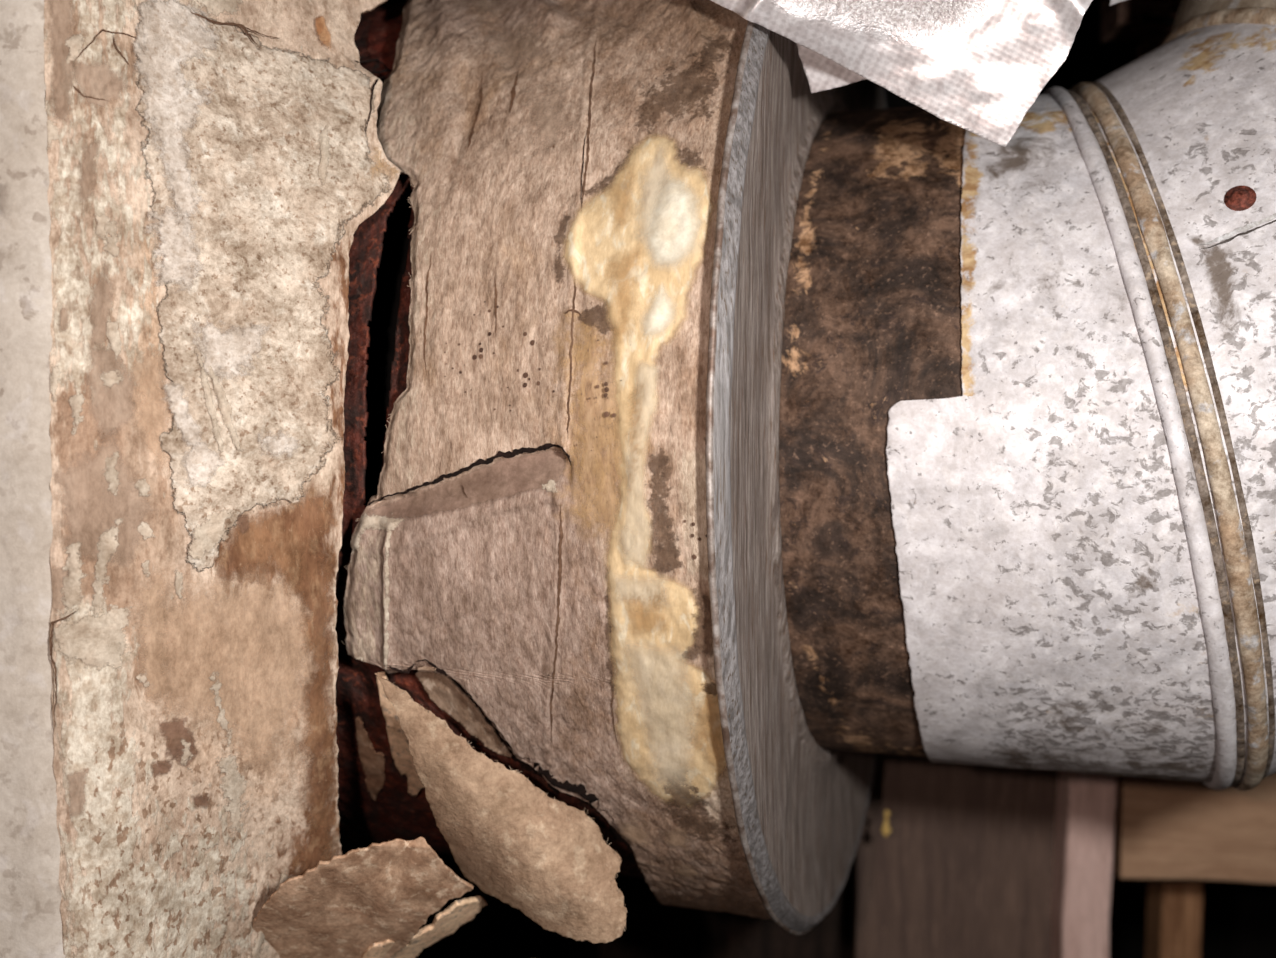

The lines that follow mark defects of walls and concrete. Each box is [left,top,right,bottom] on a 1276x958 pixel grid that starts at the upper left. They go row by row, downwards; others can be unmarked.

peeling [65,34,85,64]
crack [581,42,596,209]
peeling [50,366,85,435]
peeling [104,452,119,496]
peeling [100,322,124,387]
flaking render [133,0,391,599]
damp [554,35,737,846]
peeling [54,519,131,670]
crack [367,278,646,882]
peeling [181,740,193,771]
peeling [209,672,252,839]
peeling [362,673,627,958]